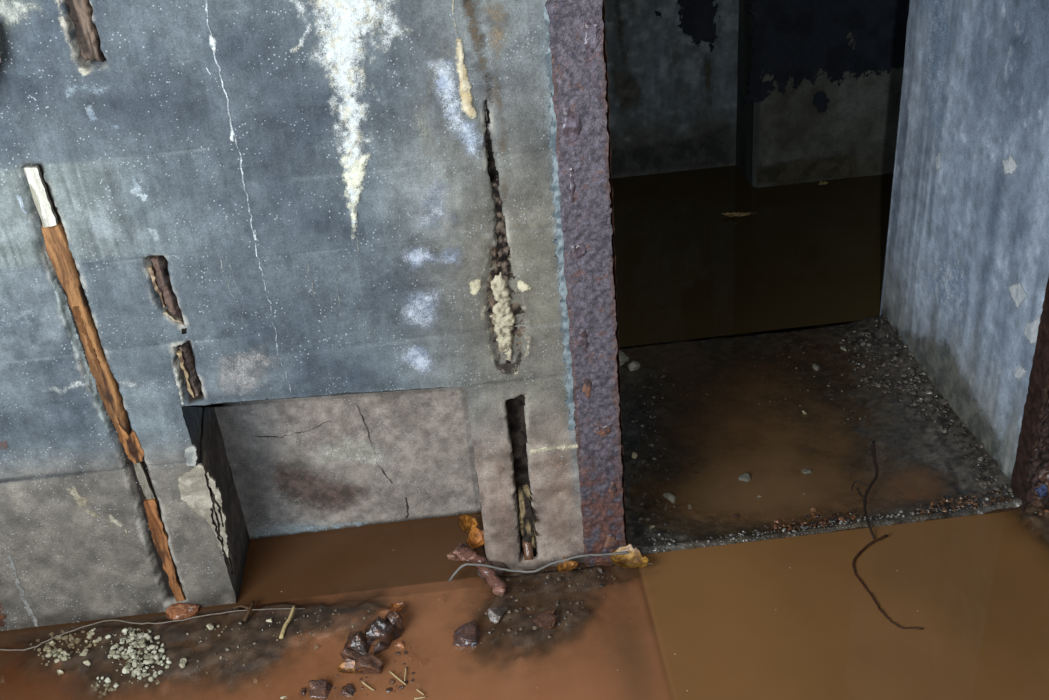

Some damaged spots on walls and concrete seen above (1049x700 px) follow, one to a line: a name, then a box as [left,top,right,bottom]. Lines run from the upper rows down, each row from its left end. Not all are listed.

spalling [56,0,91,76]
crack [205,0,270,302]
efflorescence [291,0,402,238]
crack [470,100,532,374]
corrosion [560,108,582,144]